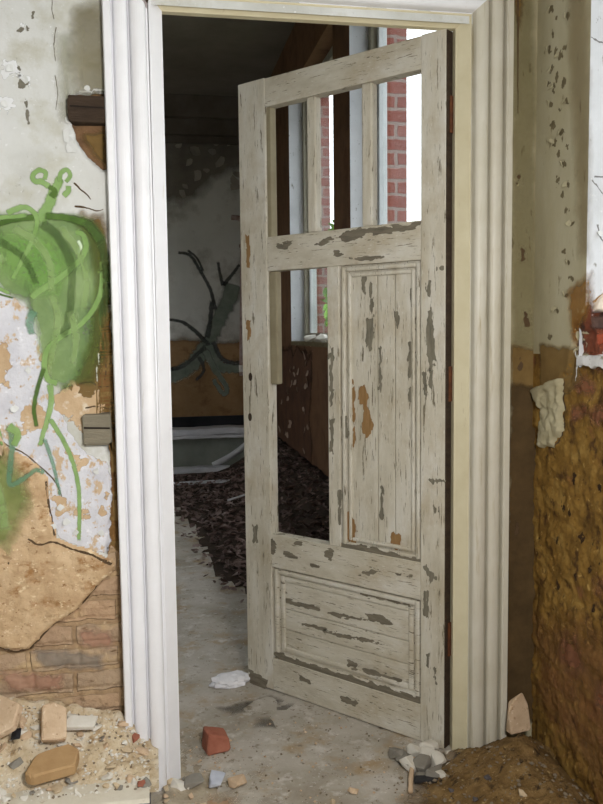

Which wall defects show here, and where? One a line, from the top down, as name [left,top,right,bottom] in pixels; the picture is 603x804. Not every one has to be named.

peeling [544,5,570,112]
flaking render [63,116,107,170]
peeling [549,121,569,167]
flaking render [562,276,603,381]
flaking render [530,378,566,448]
peeling [0,286,125,716]